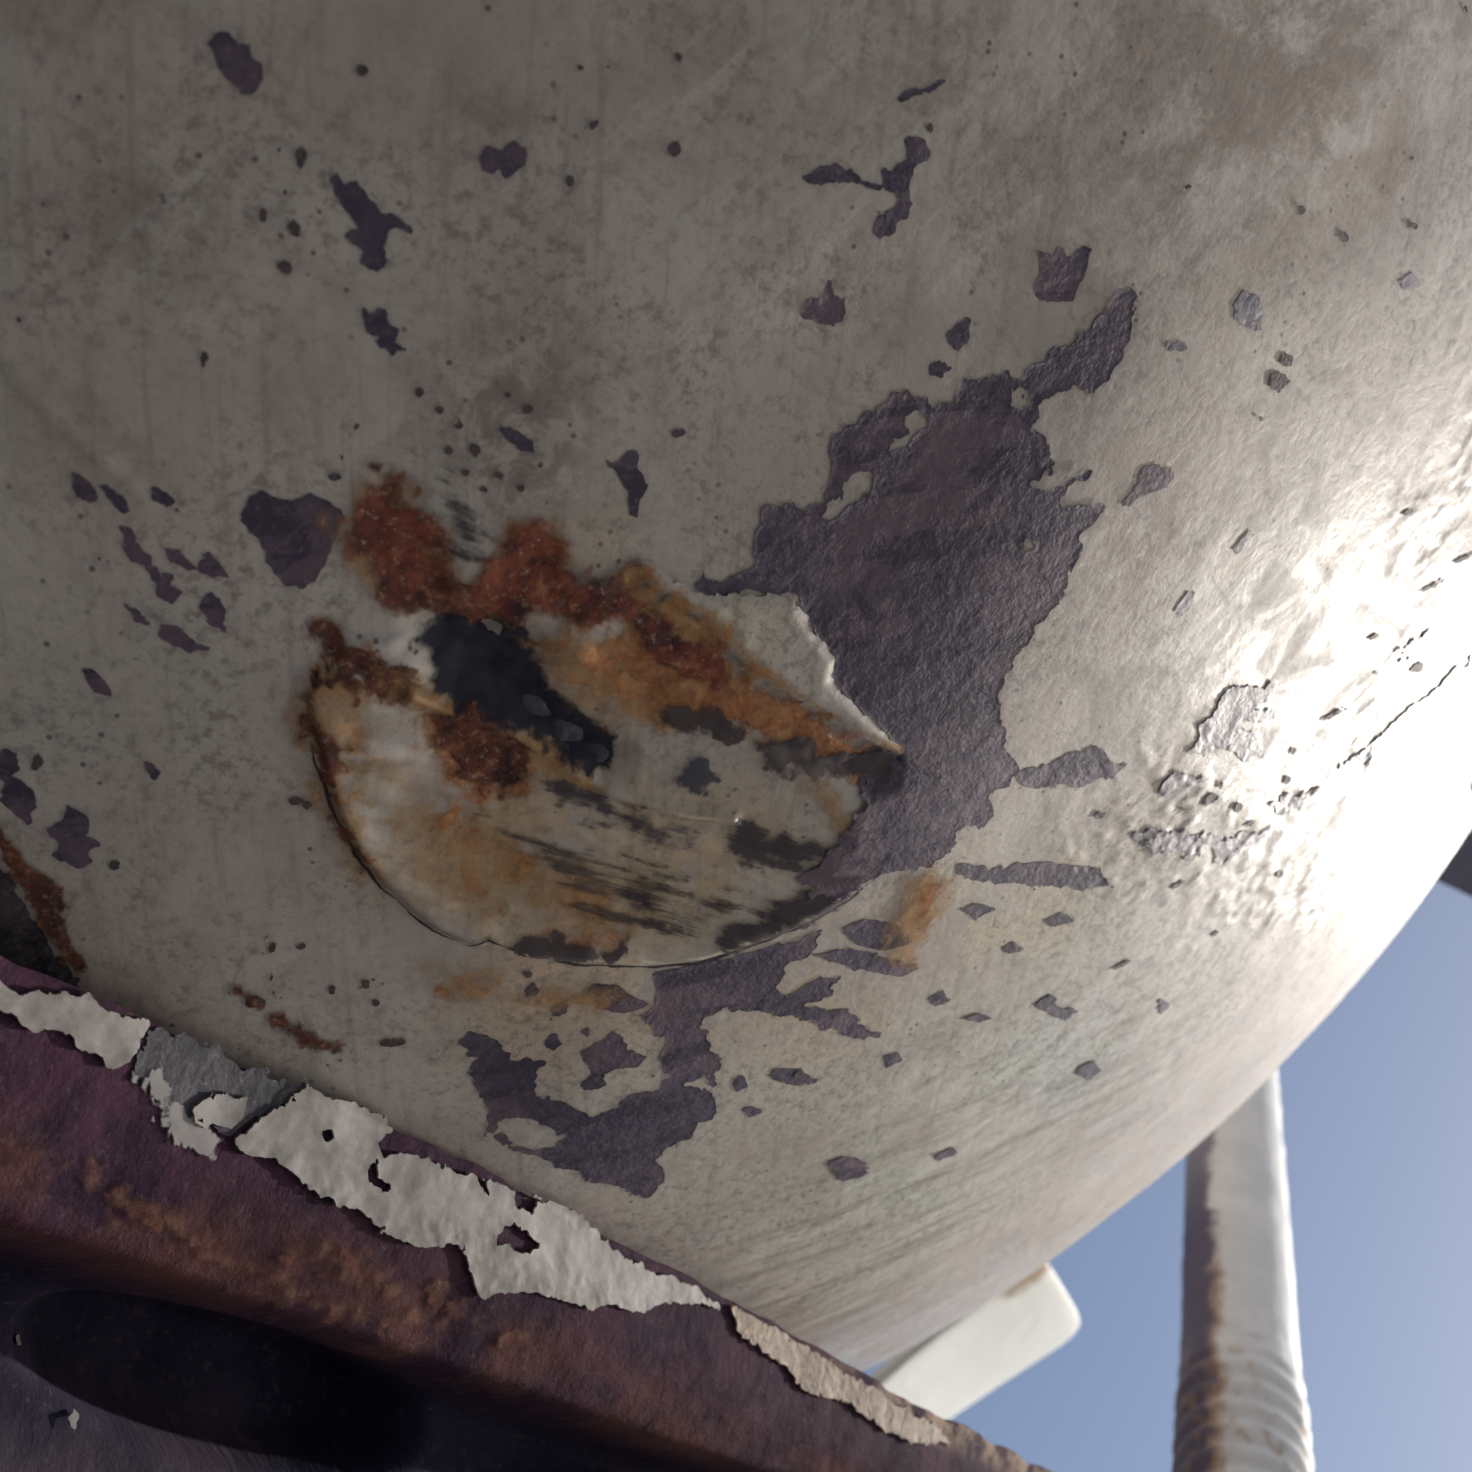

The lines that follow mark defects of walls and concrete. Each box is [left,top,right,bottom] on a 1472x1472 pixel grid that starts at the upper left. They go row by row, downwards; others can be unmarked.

peeling [329,174,413,272]
peeling [803,123,933,239]
peeling [241,490,345,589]
corrosion [340,463,870,784]
peeling [636,287,1174,902]
corrosion [290,618,596,878]
corrosion [890,873,950,967]
peeling [0,981,150,1070]
corrosion [228,986,344,1054]
peeling [459,919,919,1198]
corrosion [111,1186,252,1270]
corrosion [268,1241,477,1340]